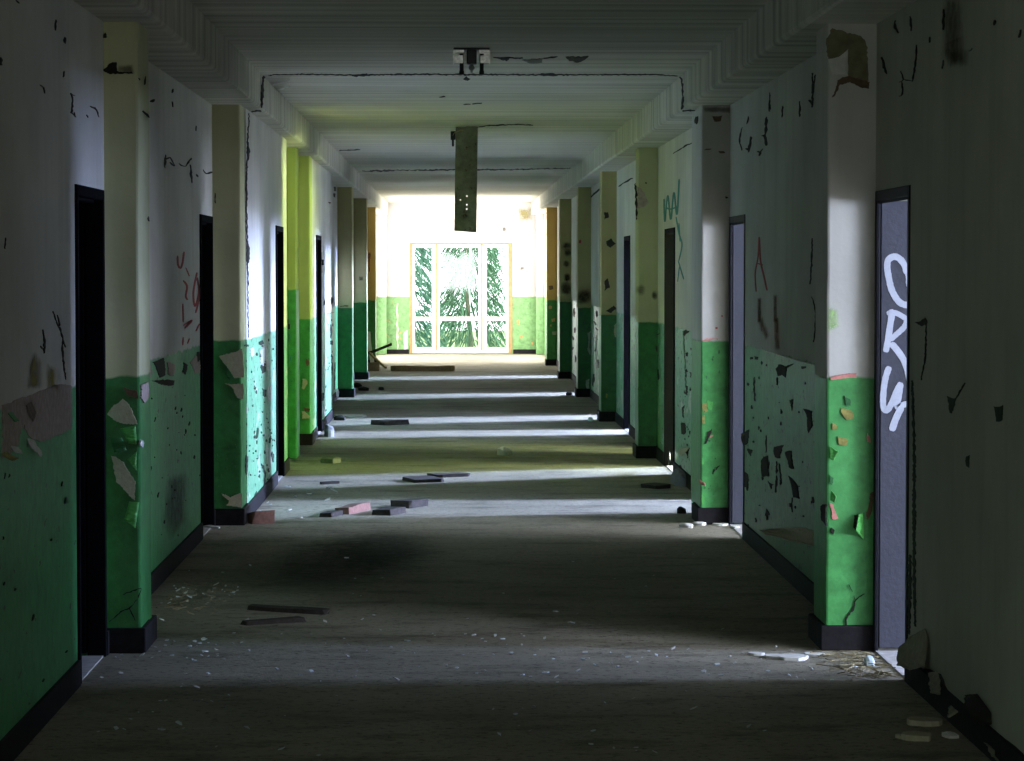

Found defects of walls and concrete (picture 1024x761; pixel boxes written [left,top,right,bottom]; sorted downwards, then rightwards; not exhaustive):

flaking render [103,62,146,85]
peeling [826,28,870,97]
crack [739,99,770,156]
crack [245,73,698,338]
crack [40,311,66,380]
peeling [107,352,201,528]
peeling [219,339,275,507]
peeling [668,330,692,468]
peeling [741,356,838,546]
peeling [853,492,874,540]
crack [845,585,864,625]
spalling [896,629,948,695]